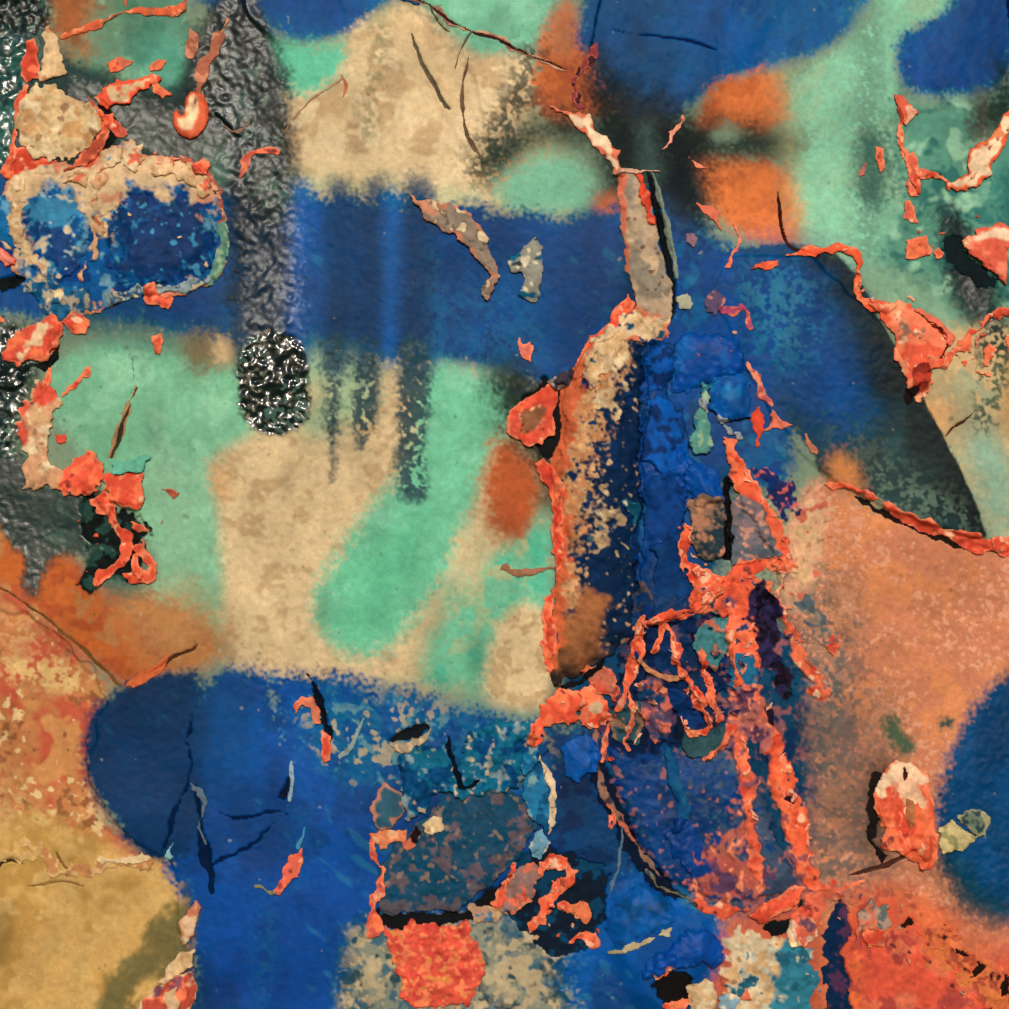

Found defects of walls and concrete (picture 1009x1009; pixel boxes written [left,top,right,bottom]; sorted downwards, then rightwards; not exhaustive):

crack [60,0,187,39]
peeling [0,18,230,595]
crack [215,113,250,137]
crack [285,75,348,132]
peeling [410,194,543,303]
crack [403,0,716,366]
peeling [751,242,1009,405]
peeling [894,94,1009,288]
crack [0,587,198,688]
peeling [366,290,1009,1009]
crack [161,721,287,895]
peeling [138,900,202,1009]